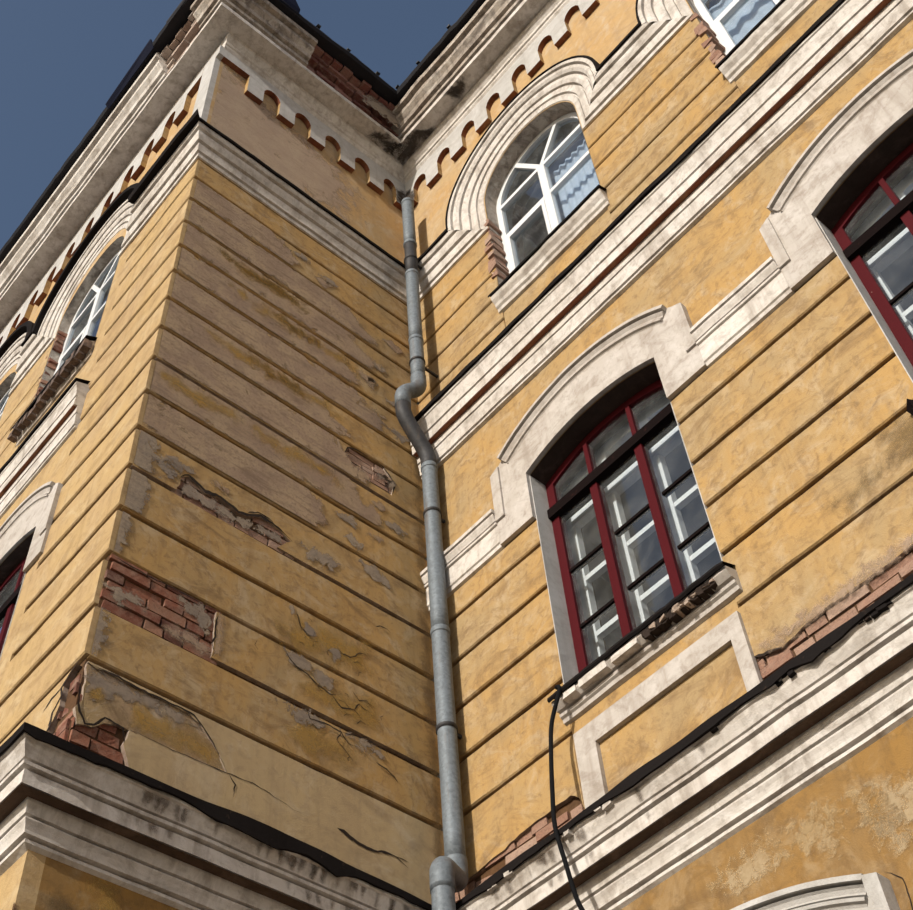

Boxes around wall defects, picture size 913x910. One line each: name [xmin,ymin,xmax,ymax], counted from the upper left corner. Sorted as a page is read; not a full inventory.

flaking render [44,179,410,783]
spalling [754,534,913,688]
crack [131,730,296,811]
crack [338,828,407,867]
spalling [455,800,615,903]
crack [887,872,913,910]